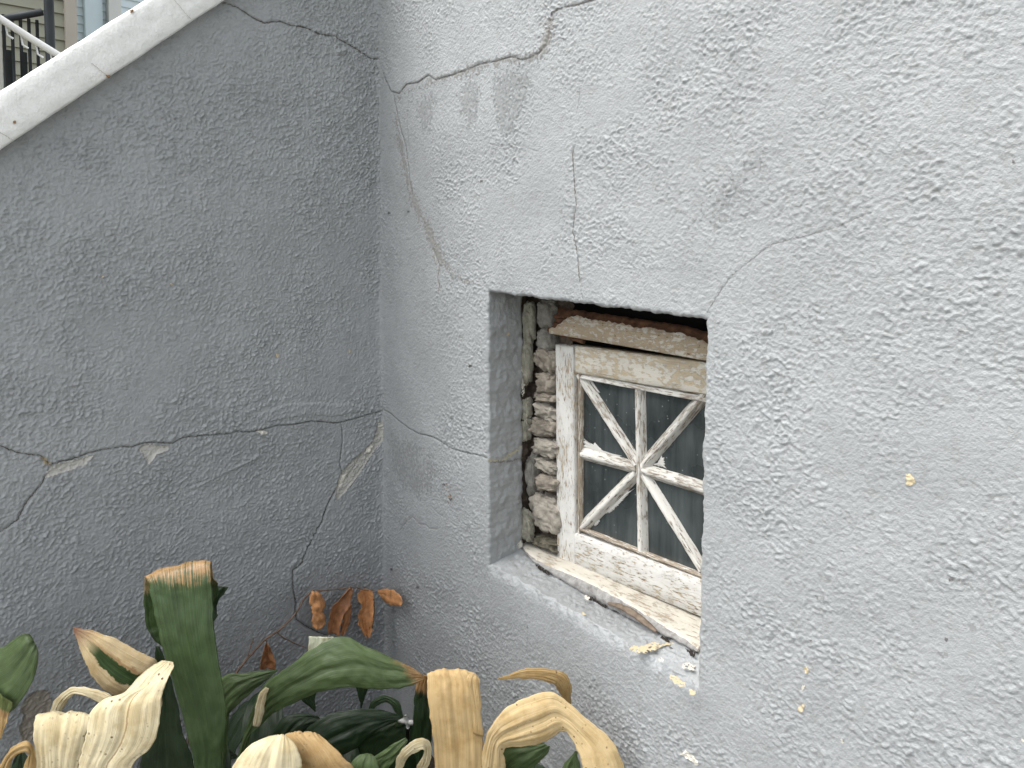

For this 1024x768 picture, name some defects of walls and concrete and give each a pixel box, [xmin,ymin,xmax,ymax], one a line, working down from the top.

crack [221,0,592,189]
crack [572,150,583,298]
spalling [40,454,94,478]
spalling [138,443,169,464]
spalling [335,421,385,499]
crack [0,410,522,635]
peeling [629,642,674,662]
peeling [669,662,696,695]